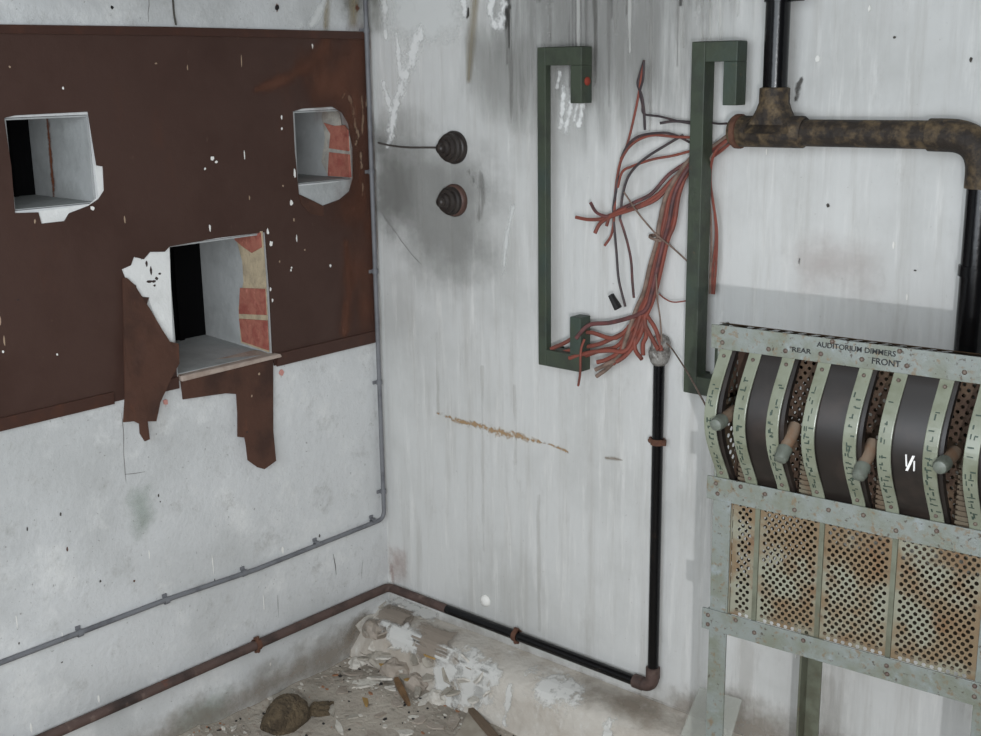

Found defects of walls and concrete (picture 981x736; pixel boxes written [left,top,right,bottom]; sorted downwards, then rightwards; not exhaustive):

water stain [373,0,507,148]
water stain [530,0,660,133]
peeling [34,166,104,223]
spalling [290,95,367,216]
peeling [122,247,173,342]
spalling [234,228,273,352]
rust [437,413,568,452]
spalling [328,598,492,736]